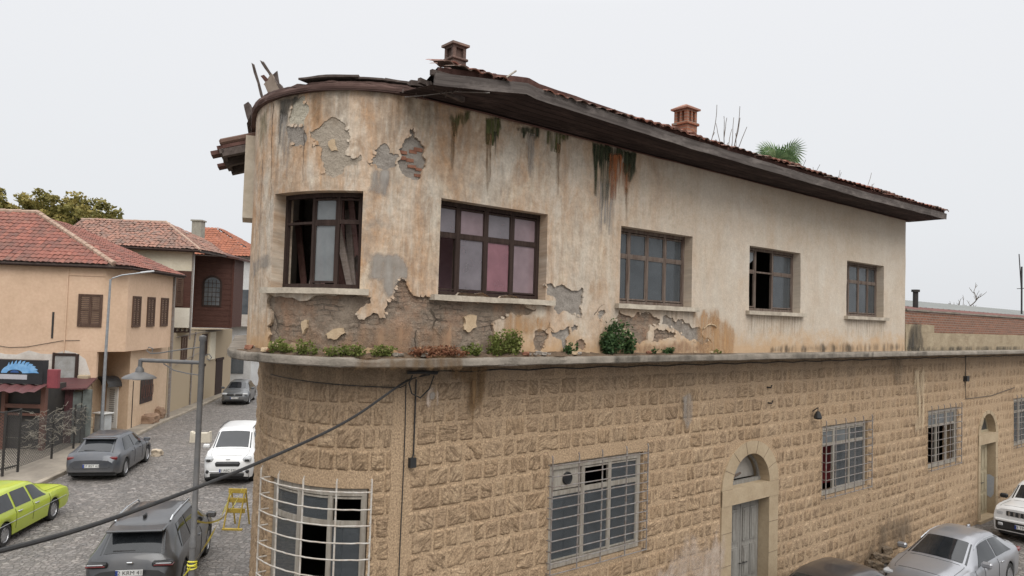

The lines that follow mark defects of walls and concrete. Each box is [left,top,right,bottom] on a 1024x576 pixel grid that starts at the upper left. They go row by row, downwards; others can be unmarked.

flaking render [286,96,425,180]
flaking render [268,278,585,353]
flaking render [597,310,710,345]